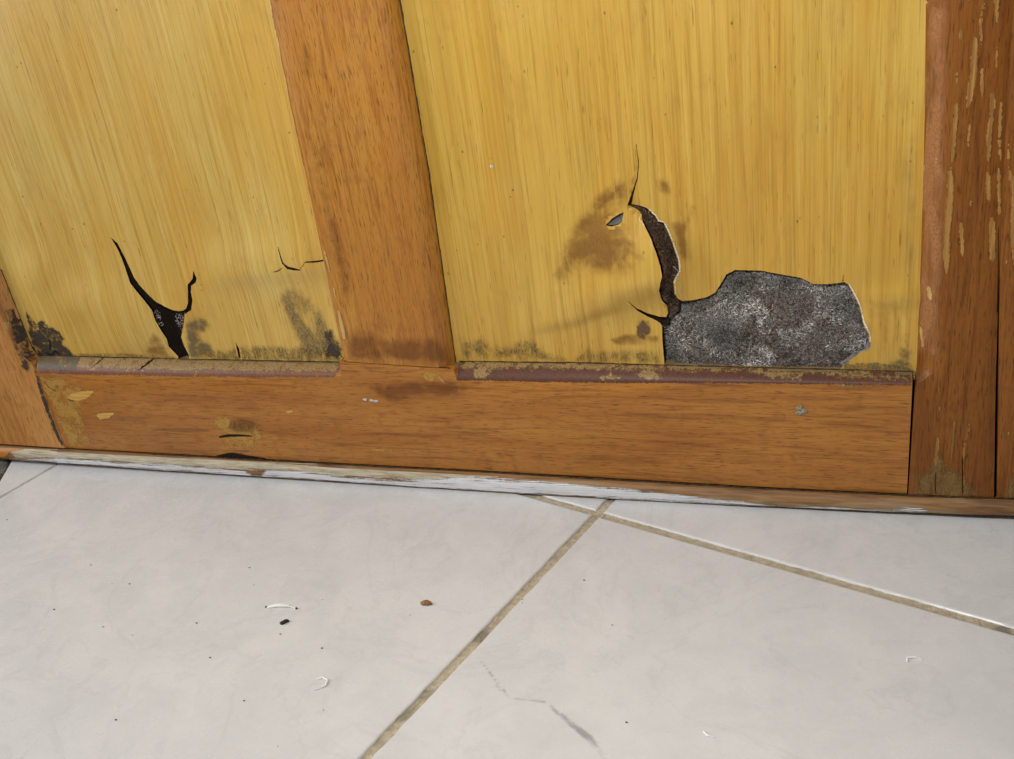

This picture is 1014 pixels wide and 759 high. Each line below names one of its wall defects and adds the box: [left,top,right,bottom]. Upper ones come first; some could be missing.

crack [628,144,639,205]
crack [275,249,323,272]
crack [114,241,197,370]
water stain [188,294,342,361]
crack [638,309,669,325]
spalling [662,270,871,368]